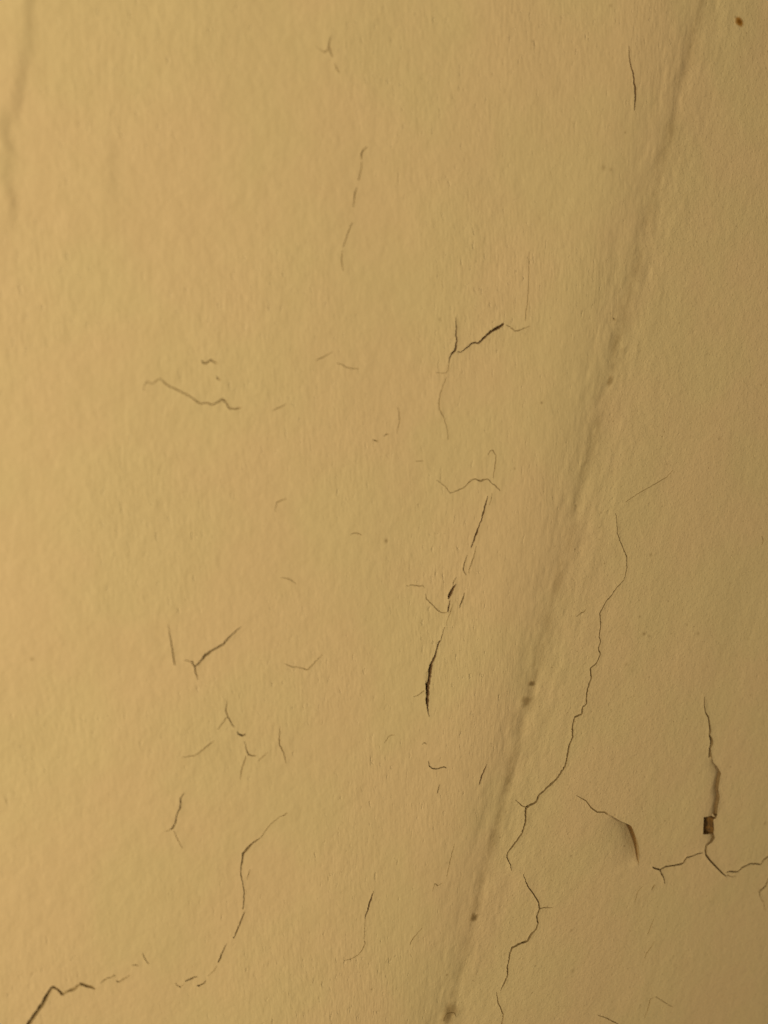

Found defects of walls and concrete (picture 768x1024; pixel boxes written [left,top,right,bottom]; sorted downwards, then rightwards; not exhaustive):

crack [628,50,636,111]
crack [144,359,241,410]
crack [436,264,529,435]
crack [409,450,500,715]
crack [168,624,239,680]
crack [167,793,184,847]
crack [496,470,673,1024]
peeling [700,697,727,877]
crack [176,813,287,988]
crack [634,852,703,957]
crack [726,856,768,909]
crack [27,953,149,1024]